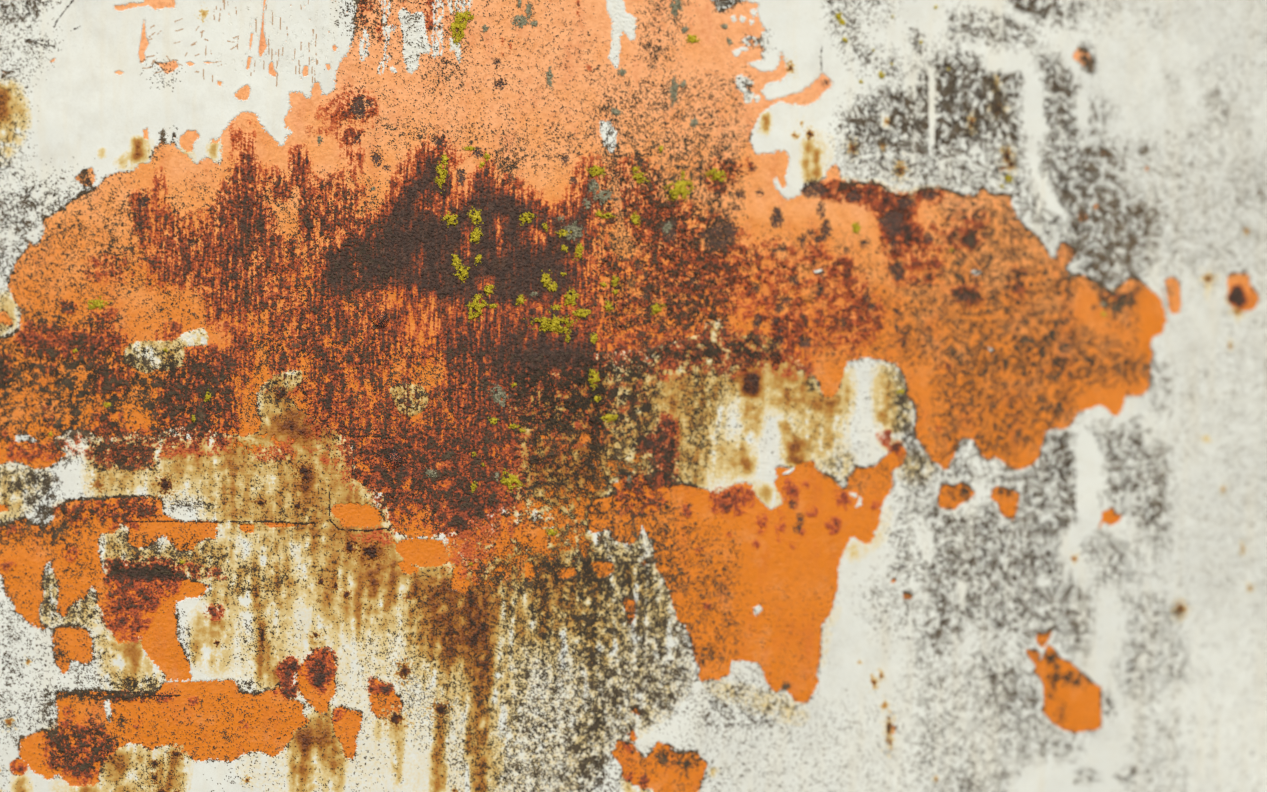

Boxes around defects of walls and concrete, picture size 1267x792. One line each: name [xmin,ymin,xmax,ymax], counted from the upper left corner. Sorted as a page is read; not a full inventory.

peeling [0,0,1182,483]
peeling [1227,273,1259,312]
rust [0,77,992,792]
peeling [938,483,975,510]
peeling [991,486,1019,520]
peeling [1099,508,1122,528]
peeling [330,447,906,703]
peeling [0,496,402,787]
peeling [1026,631,1106,733]
peeling [612,731,707,792]